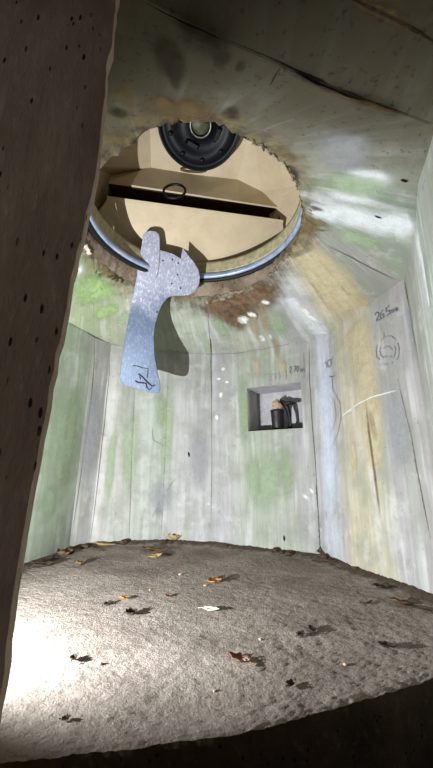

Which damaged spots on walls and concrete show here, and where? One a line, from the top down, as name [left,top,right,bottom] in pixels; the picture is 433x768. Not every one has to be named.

crack [147,0,432,125]
spalling [246,138,298,187]
rust [205,282,276,334]